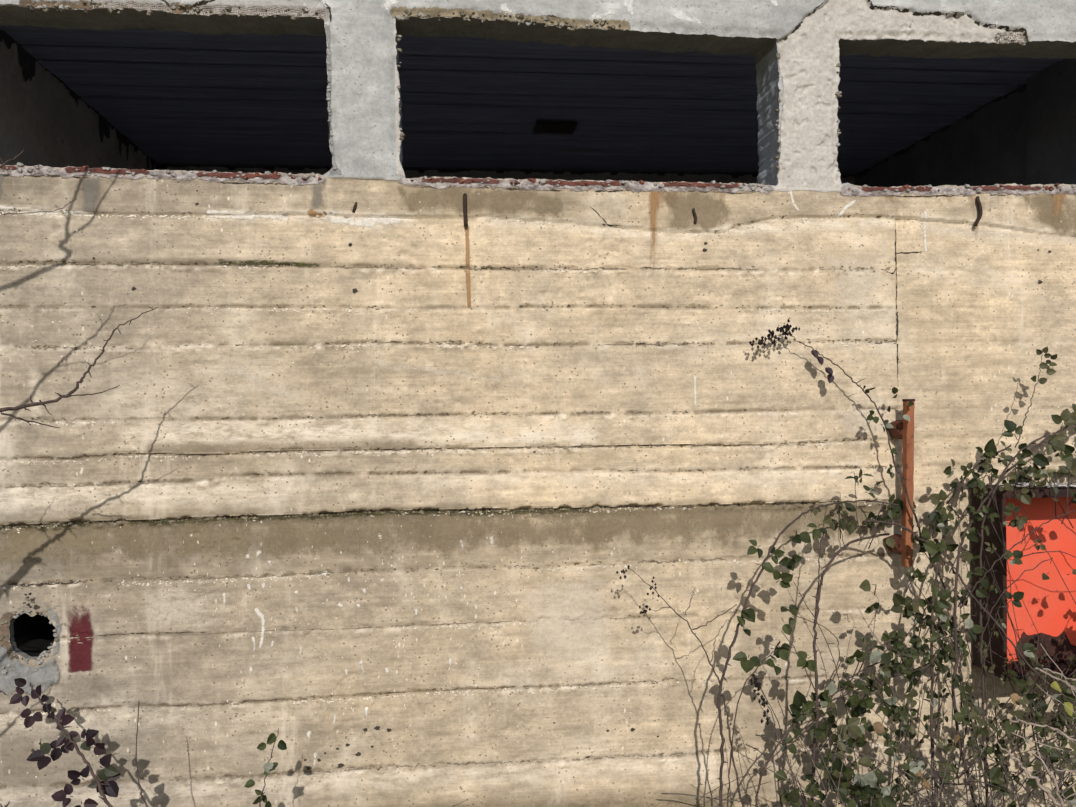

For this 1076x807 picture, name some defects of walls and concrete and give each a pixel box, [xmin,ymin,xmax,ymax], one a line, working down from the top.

flaking render [19,0,341,181]
flaking render [602,0,1028,192]
damp [314,185,401,227]
damp [399,186,560,215]
rust [650,181,737,242]
peeling [883,184,1004,194]
damp [1028,194,1076,233]
spalling [0,581,91,675]